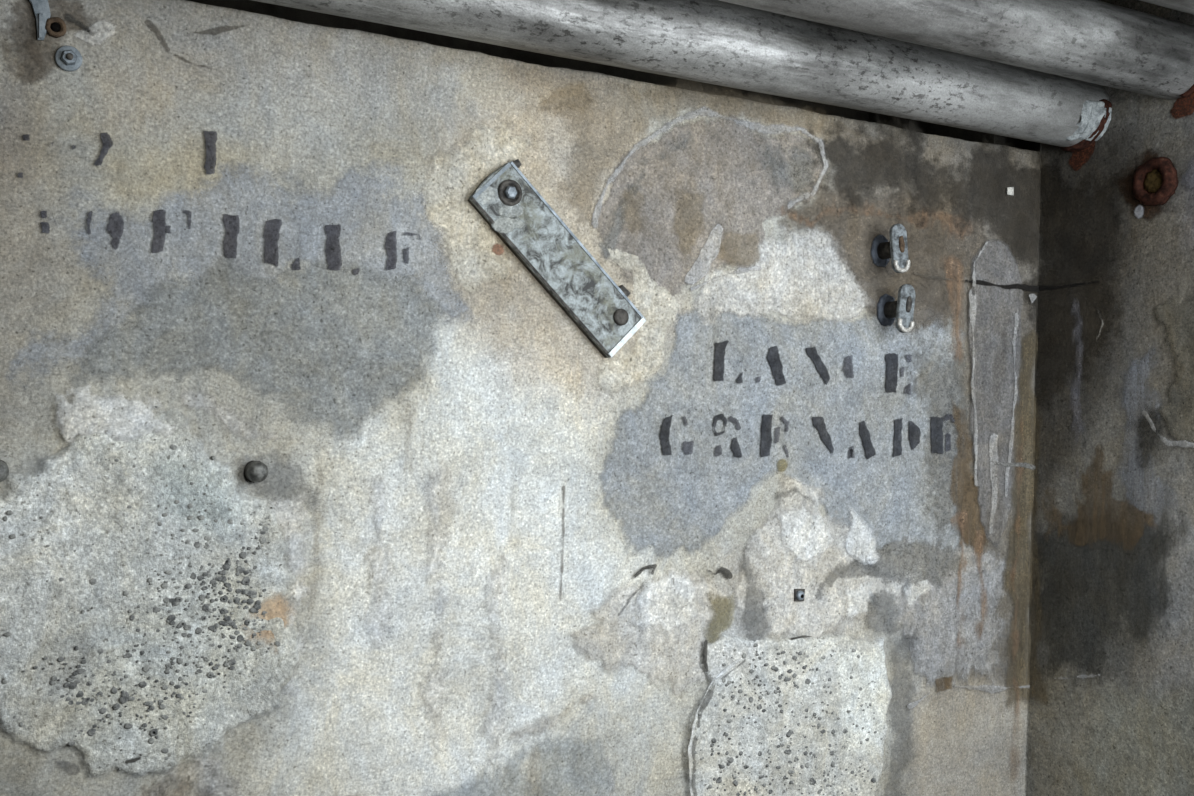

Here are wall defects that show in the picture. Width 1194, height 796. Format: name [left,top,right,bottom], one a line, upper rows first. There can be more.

corrosion [8,0,90,82]
corrosion [1170,92,1194,119]
water stain [788,117,1166,534]
crack [914,273,1099,303]
peeling [57,386,176,441]
peeling [272,499,307,652]
corrosion [952,407,987,563]
water stain [1035,354,1185,674]